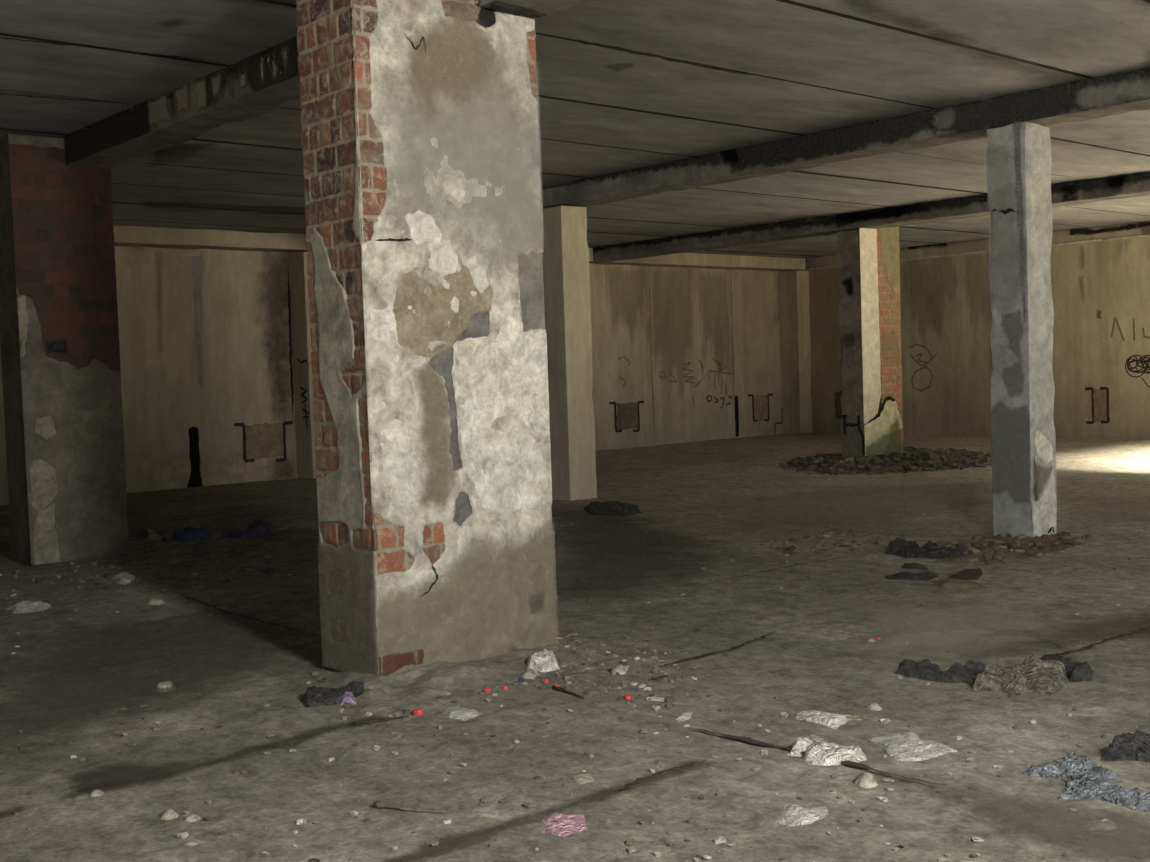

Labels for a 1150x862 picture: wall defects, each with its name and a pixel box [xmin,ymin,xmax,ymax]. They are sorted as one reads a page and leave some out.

flaking render [8,143,121,372]
flaking render [296,0,552,575]
flaking render [864,229,904,456]
flaking render [35,415,56,440]
flaking render [30,459,61,565]
crack [420,562,438,597]
flaking render [379,650,424,676]